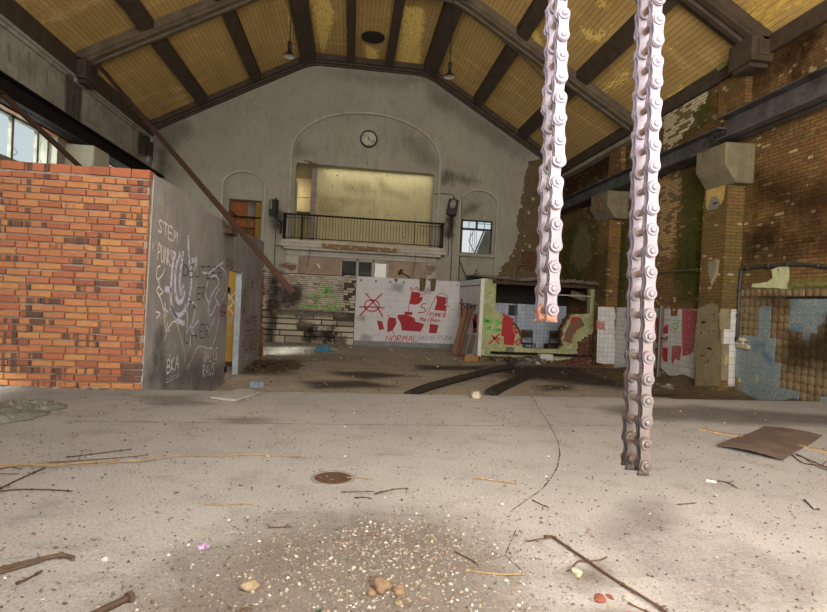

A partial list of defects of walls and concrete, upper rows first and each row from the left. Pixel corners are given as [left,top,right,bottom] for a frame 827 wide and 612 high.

flaking render [499,158,543,278]
spalling [557,316,570,346]
flaking render [574,334,593,359]
crack [494,397,561,570]